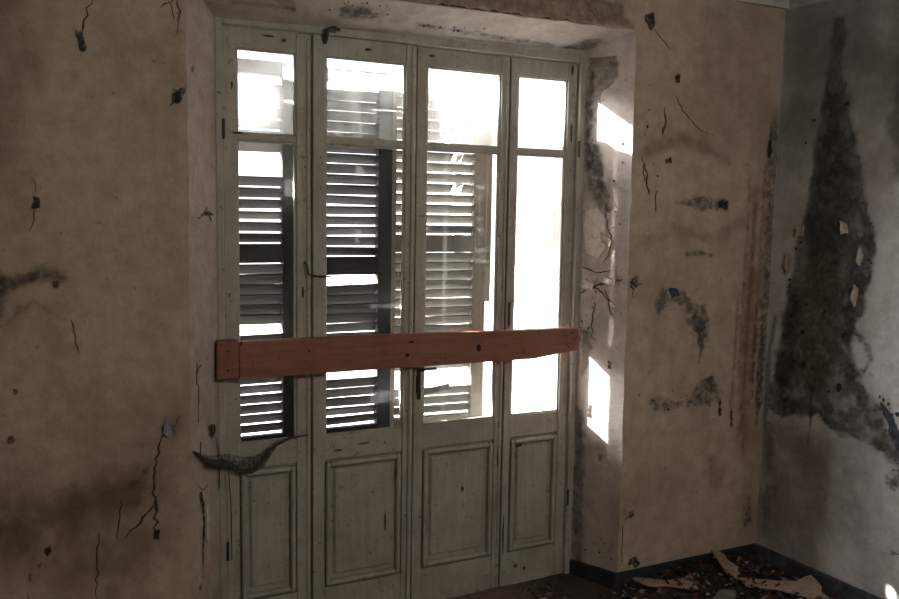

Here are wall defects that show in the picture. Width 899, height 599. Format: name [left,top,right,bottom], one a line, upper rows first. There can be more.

crack [580,267,643,338]
crack [94,365,201,599]